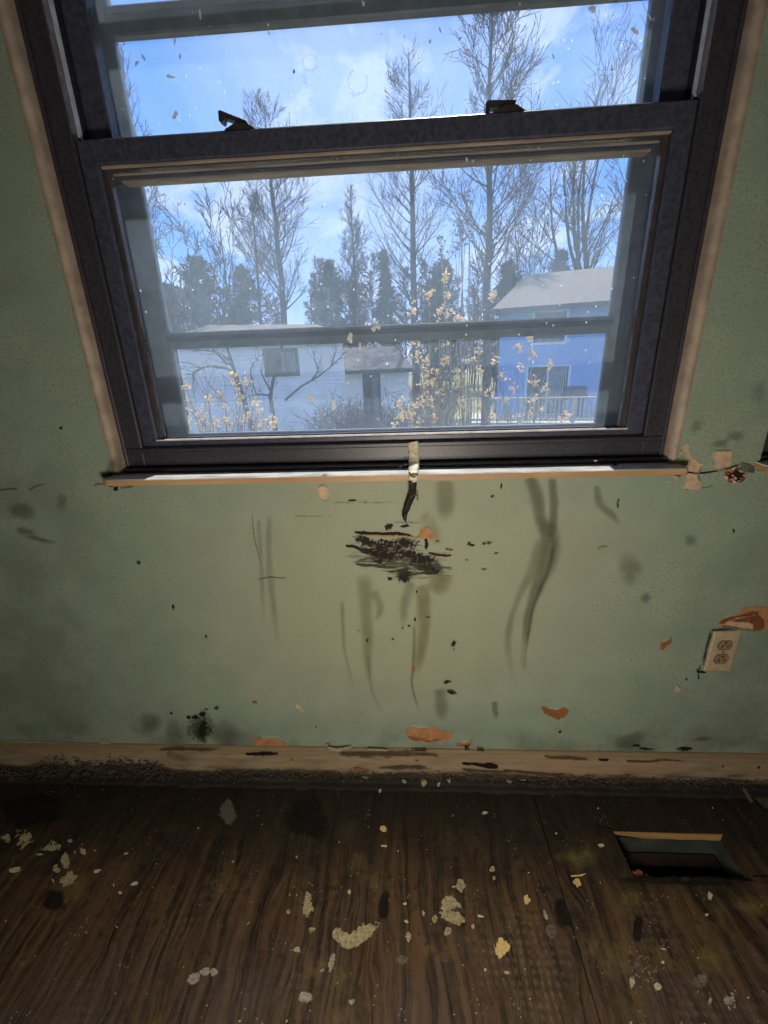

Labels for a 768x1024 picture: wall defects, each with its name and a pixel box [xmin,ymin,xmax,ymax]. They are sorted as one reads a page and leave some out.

peeling [671,444,732,491]
peeling [717,606,768,632]
peeling [541,706,569,720]
leakage [161,707,218,751]
peeling [406,725,473,747]
leakage [340,751,436,770]
leakage [462,763,564,776]
leakage [627,745,693,763]